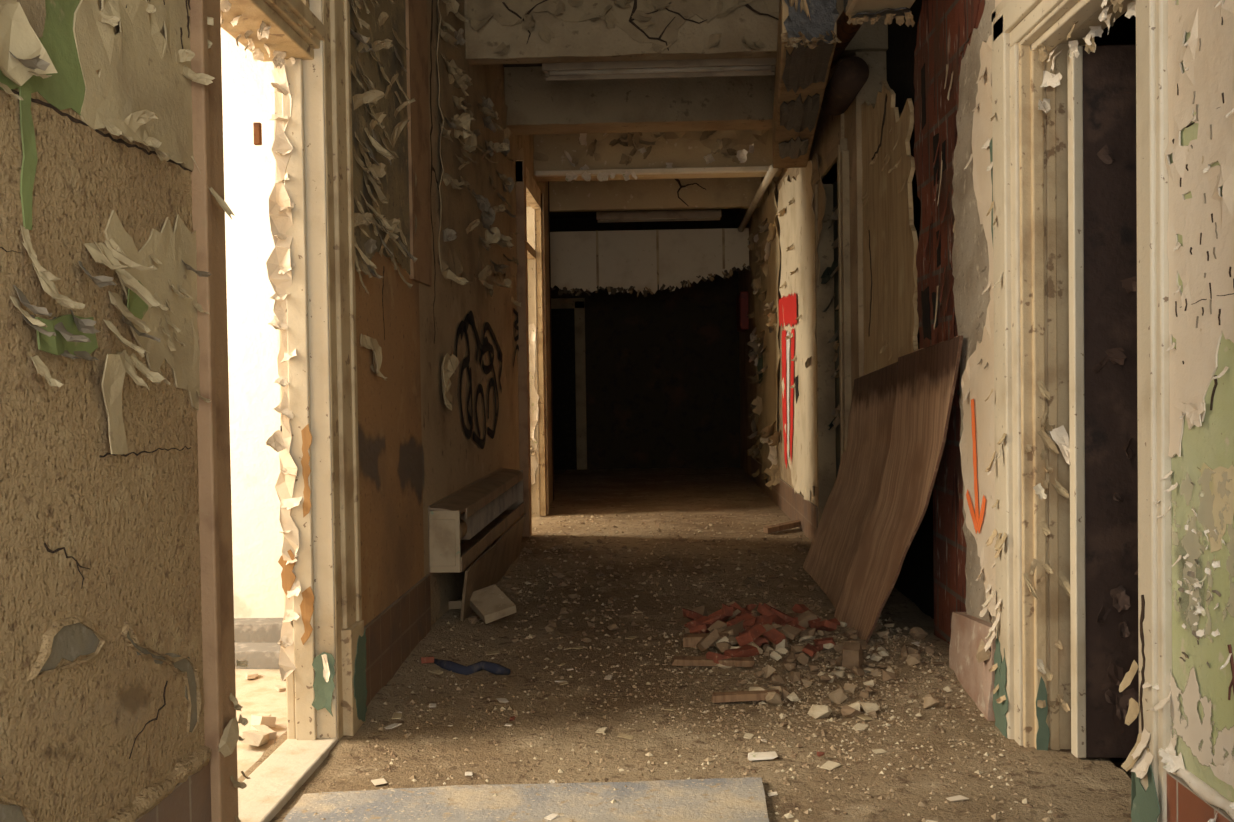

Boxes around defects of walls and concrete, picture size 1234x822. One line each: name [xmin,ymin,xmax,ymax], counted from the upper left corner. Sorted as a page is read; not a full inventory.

crack [502,0,548,43]
crack [629,0,707,51]
crack [745,4,779,20]
crack [0,89,192,172]
peeling [350,0,417,294]
peeling [0,0,215,455]
peeling [207,0,315,681]
peeling [1155,0,1234,645]
crack [44,543,90,589]
peeling [312,652,335,716]
peeling [353,628,367,722]
peeling [1105,652,1234,822]